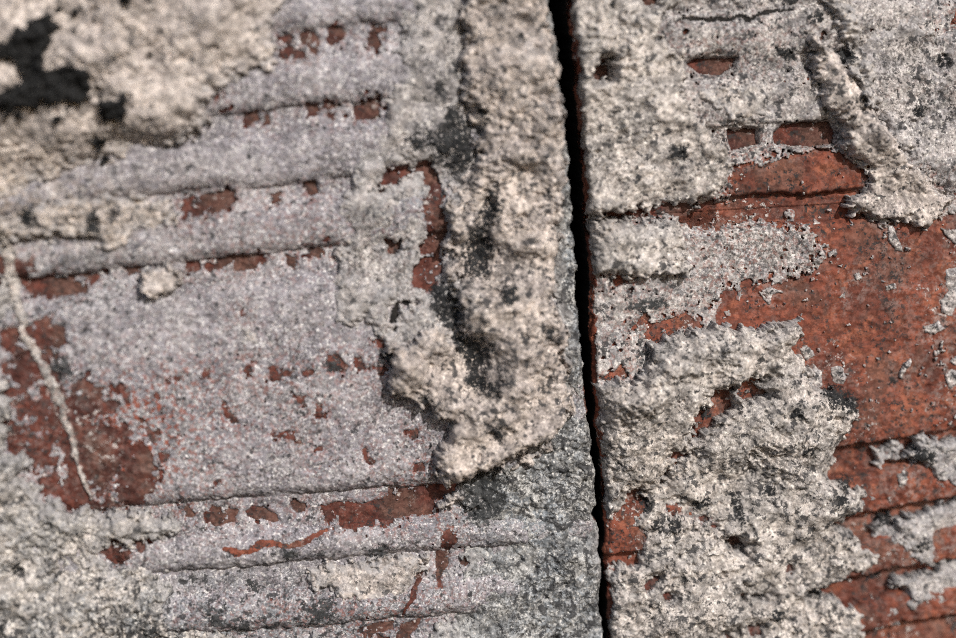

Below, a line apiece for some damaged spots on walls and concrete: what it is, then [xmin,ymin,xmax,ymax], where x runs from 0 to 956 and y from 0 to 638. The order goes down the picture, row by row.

crack [568,7,582,74]
peeling [377,160,448,292]
peeling [0,256,100,299]
peeling [185,250,267,276]
crack [590,272,598,336]
peeling [604,121,956,638]
peeling [0,314,170,511]
peeling [176,503,279,526]
peeling [320,483,457,532]
peeling [100,538,149,567]
peeling [435,525,468,589]
crack [606,594,614,638]